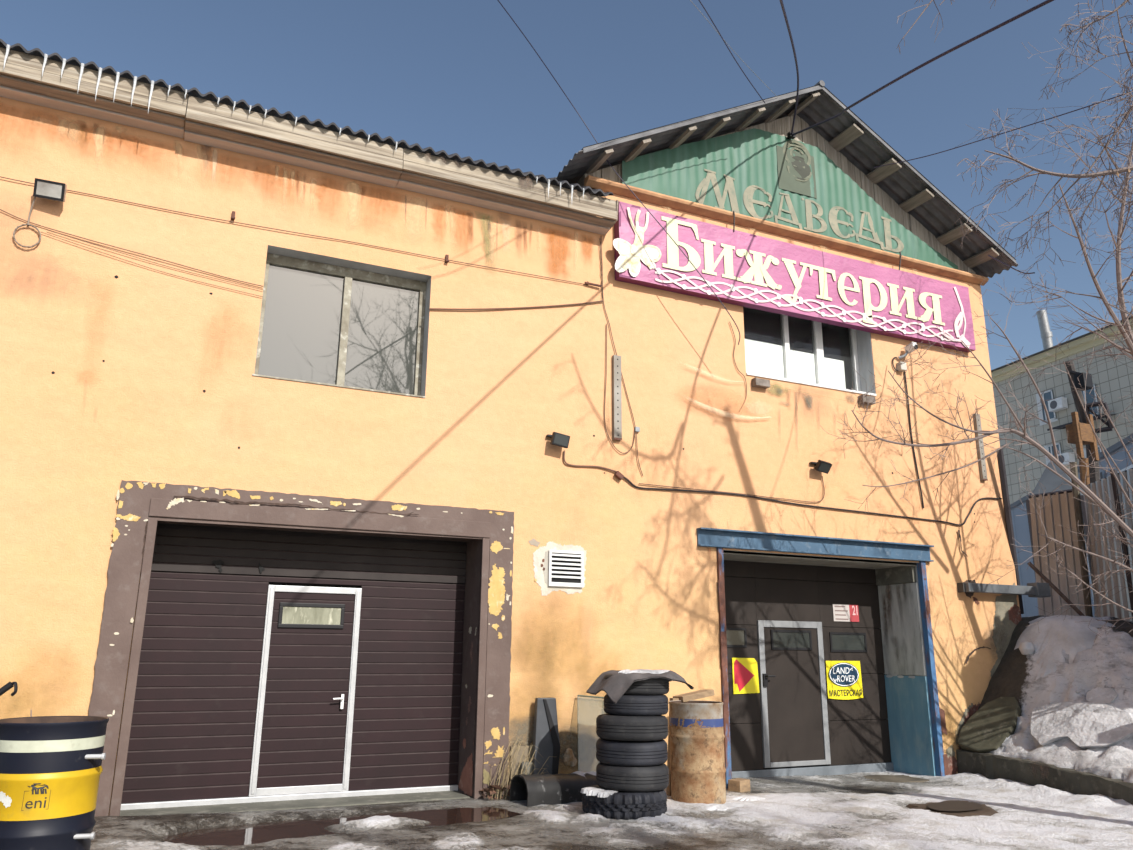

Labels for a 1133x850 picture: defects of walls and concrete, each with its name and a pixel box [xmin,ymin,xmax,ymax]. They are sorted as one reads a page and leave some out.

leakage [482,215,494,260]
peeling [111,482,166,547]
peeling [166,487,361,512]
peeling [389,504,420,517]
peeling [468,526,513,664]
peeling [529,538,587,596]
flaking render [458,684,505,796]